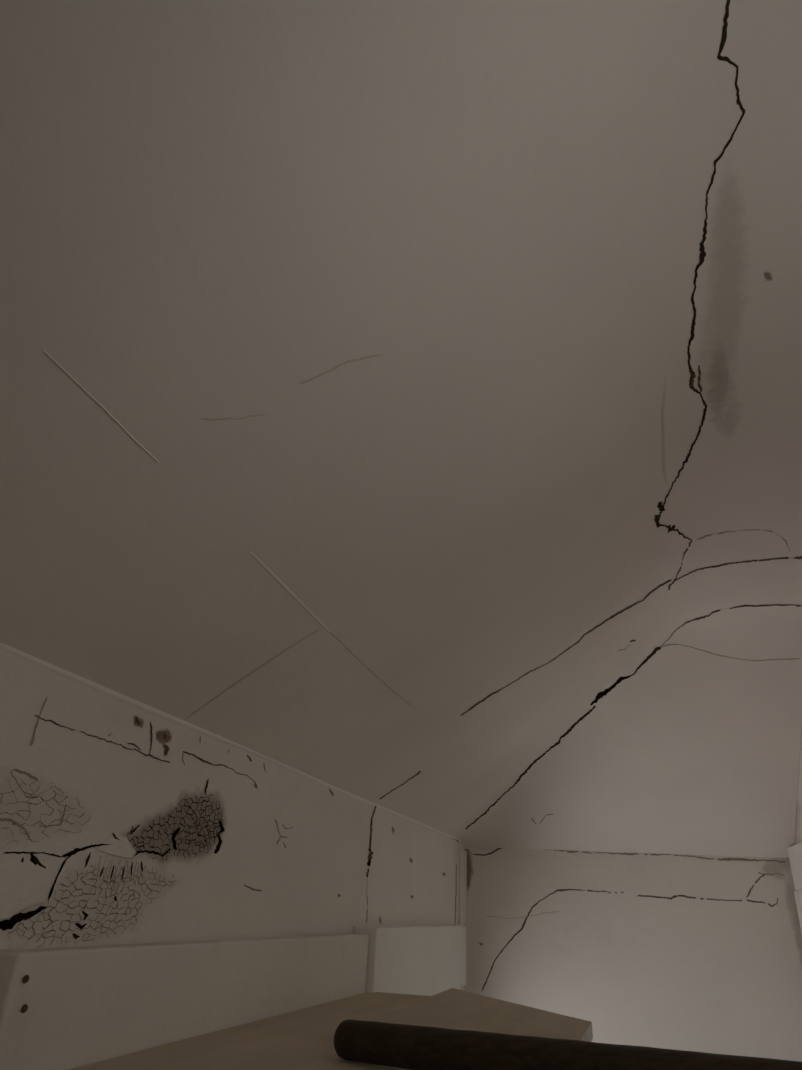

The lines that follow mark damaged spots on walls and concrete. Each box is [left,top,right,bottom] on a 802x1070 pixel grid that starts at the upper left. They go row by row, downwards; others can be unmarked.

crack [461,0,802,716]
crack [0,769,95,847]
crack [7,794,224,947]
crack [30,697,266,787]
crack [275,819,294,848]
crack [366,771,421,922]
crack [453,604,802,925]
crack [482,729,802,991]